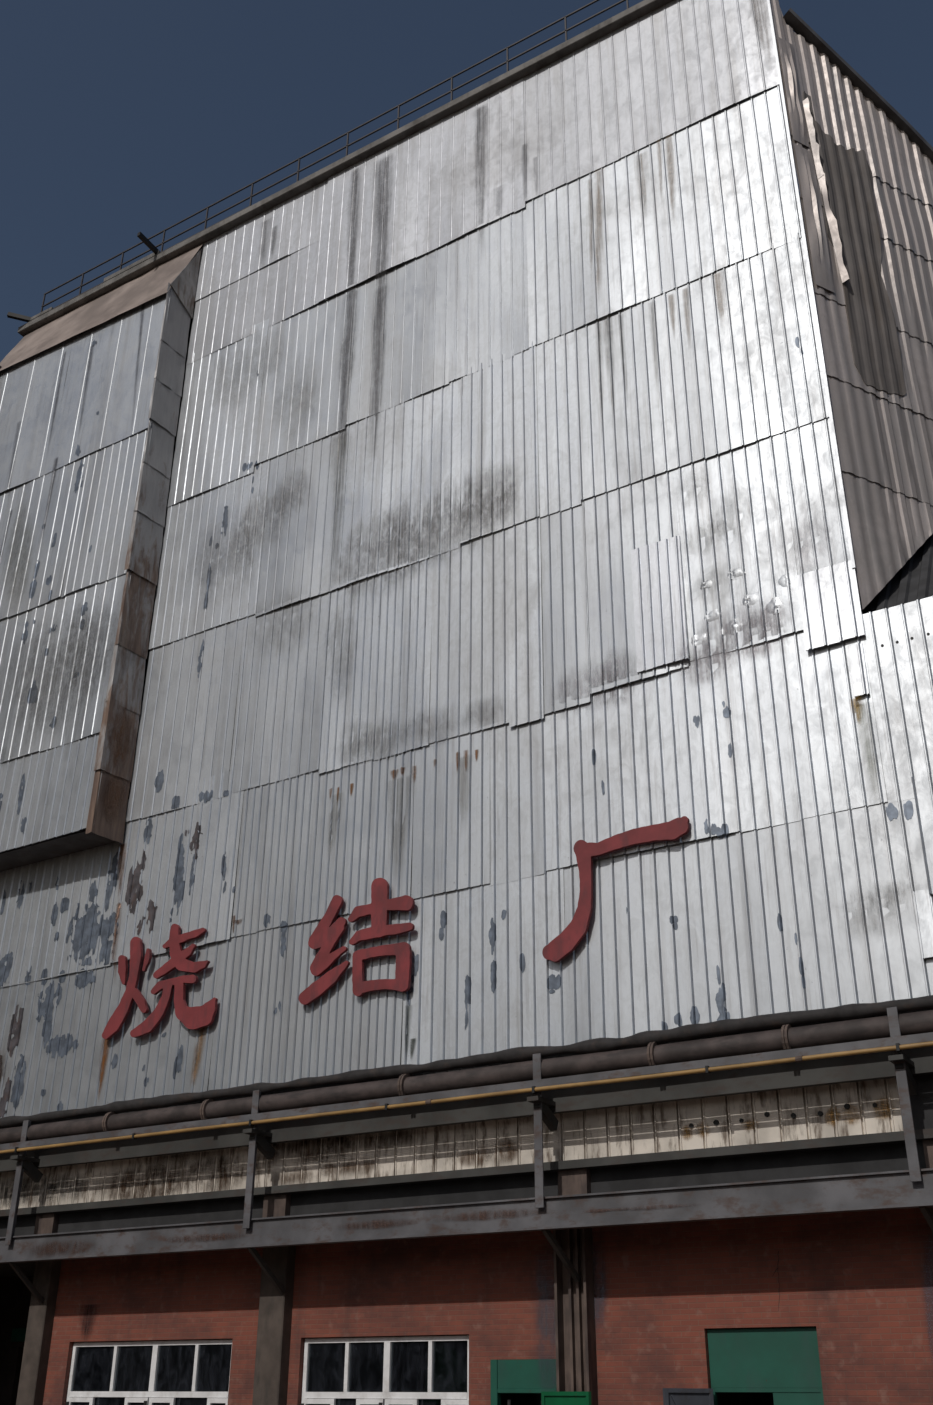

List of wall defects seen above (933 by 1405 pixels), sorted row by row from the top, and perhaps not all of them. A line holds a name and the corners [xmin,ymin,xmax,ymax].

water stain [341,170,358,439]
water stain [372,161,389,422]
peeling [199,790,229,803]
peeling [0,815,203,1118]